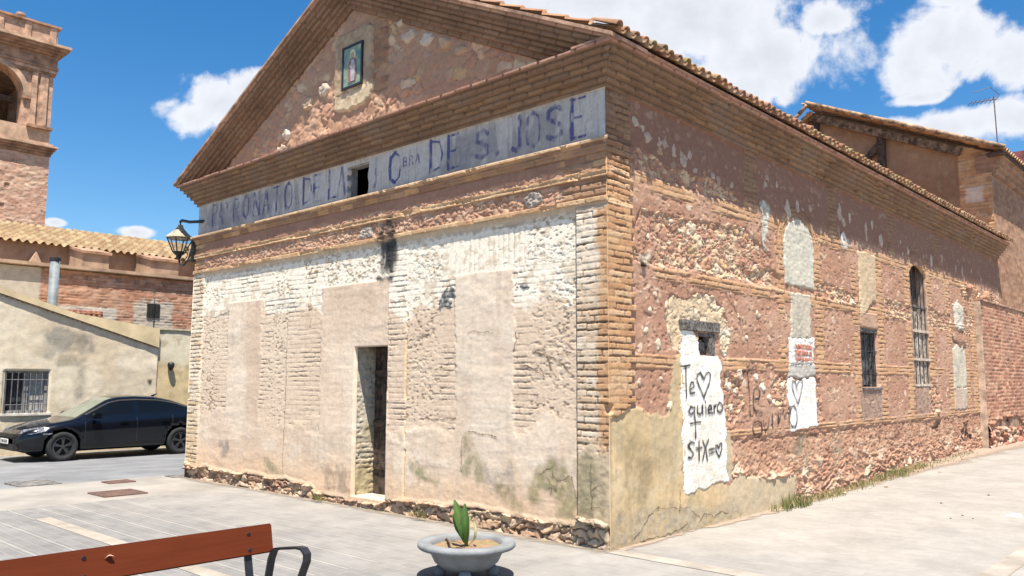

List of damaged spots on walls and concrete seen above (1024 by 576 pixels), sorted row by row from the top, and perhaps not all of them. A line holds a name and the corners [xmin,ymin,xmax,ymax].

spalling [633,207,772,287]
spalling [439,287,456,312]
peeling [550,284,577,314]
spalling [644,292,983,500]
crack [634,492,727,543]